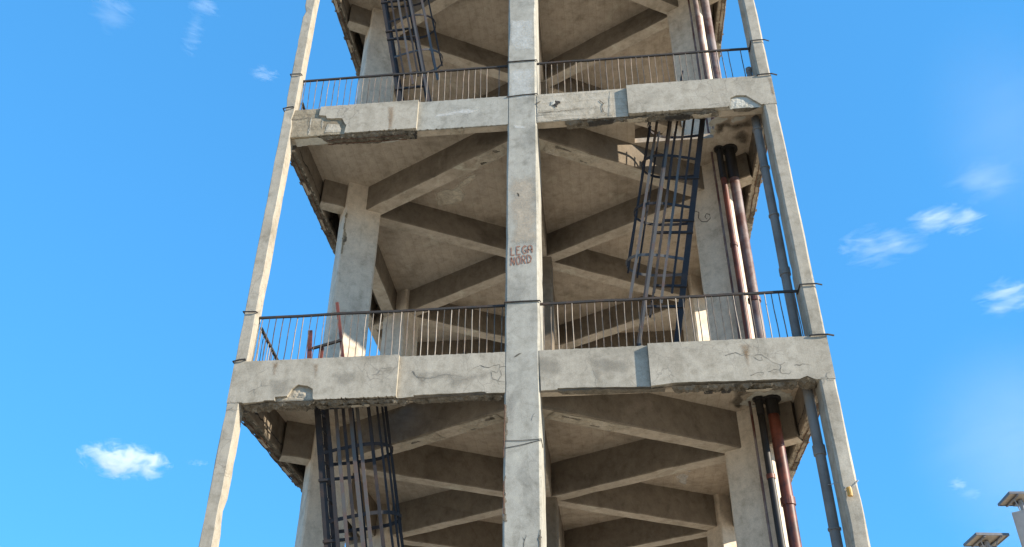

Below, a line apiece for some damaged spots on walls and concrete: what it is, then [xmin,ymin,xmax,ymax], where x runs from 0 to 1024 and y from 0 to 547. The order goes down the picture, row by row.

flaking render [537,90,760,135]
flaking render [290,110,417,254]
crack [725,352,830,382]
spalling [241,386,508,492]
spalling [546,376,820,482]